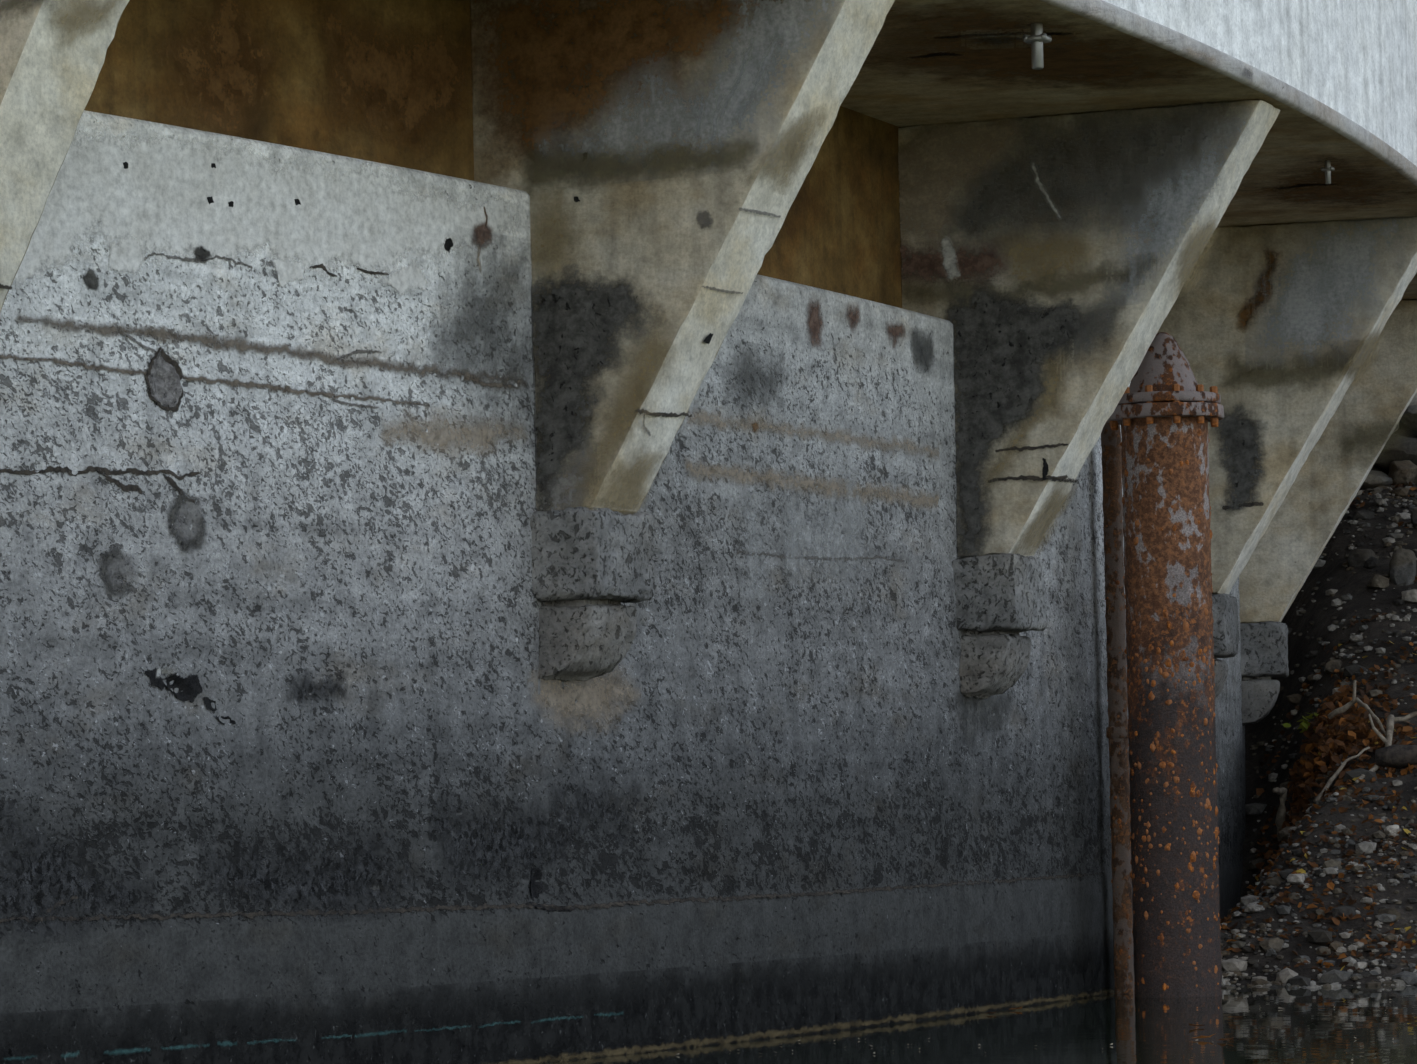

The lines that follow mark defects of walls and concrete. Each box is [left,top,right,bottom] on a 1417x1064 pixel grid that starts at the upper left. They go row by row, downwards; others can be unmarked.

crack [143,252,252,268]
crack [310,264,389,277]
corrosion [1179,220,1216,287]
corrosion [1239,250,1279,330]
crack [0,284,526,409]
corrosion [808,302,823,346]
corrosion [848,307,860,328]
corrosion [888,324,905,346]
crack [989,443,1078,483]
crack [0,465,199,503]
spalling [143,668,236,725]